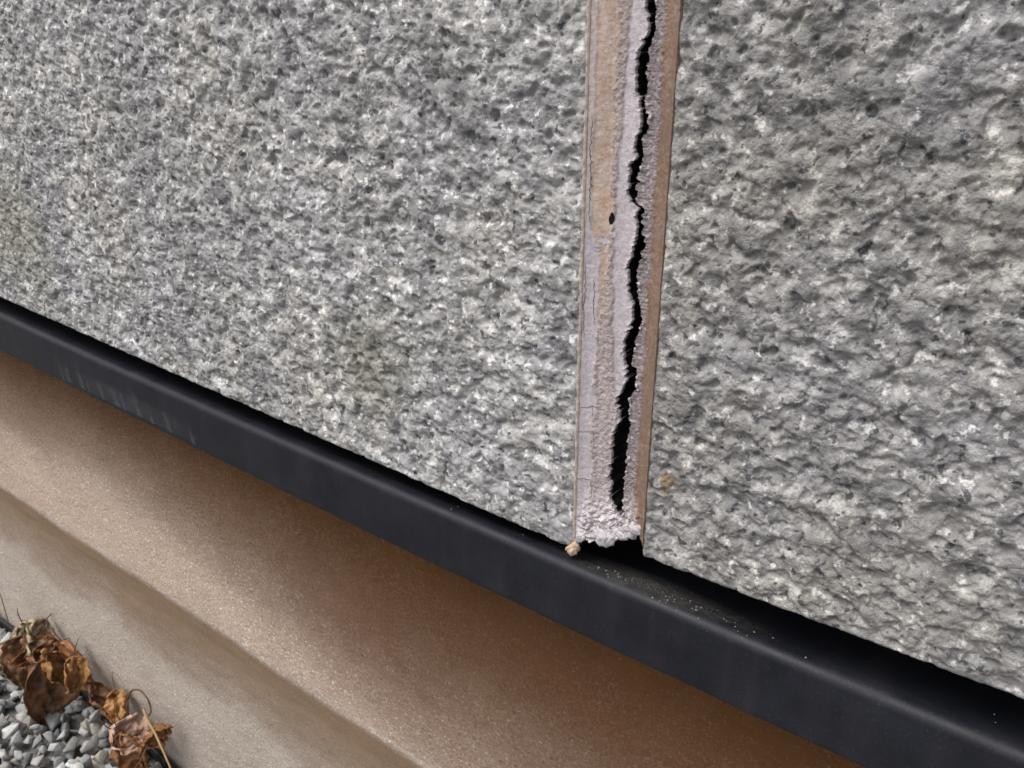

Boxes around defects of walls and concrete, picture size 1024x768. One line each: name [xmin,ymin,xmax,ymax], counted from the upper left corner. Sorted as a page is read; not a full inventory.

crack [578,0,658,516]